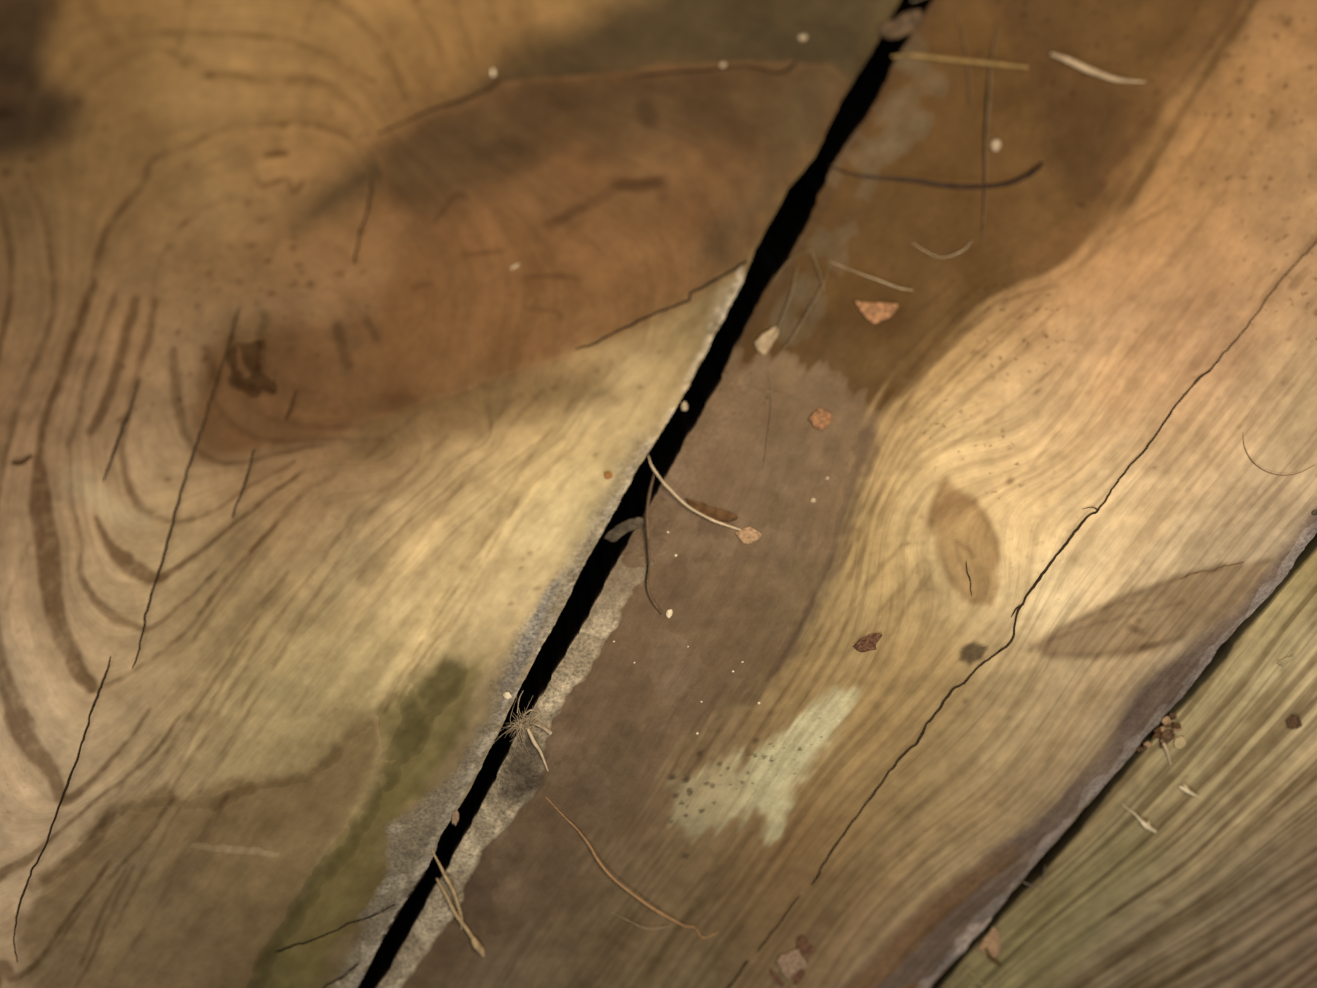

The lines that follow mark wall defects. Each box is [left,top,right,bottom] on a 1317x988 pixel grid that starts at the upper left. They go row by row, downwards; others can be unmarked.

leakage [51,461,159,538]
crack [13,309,239,963]
leakage [12,710,382,988]
leakage [218,301,279,362]
leakage [274,0,1317,988]
crack [728,241,1317,988]